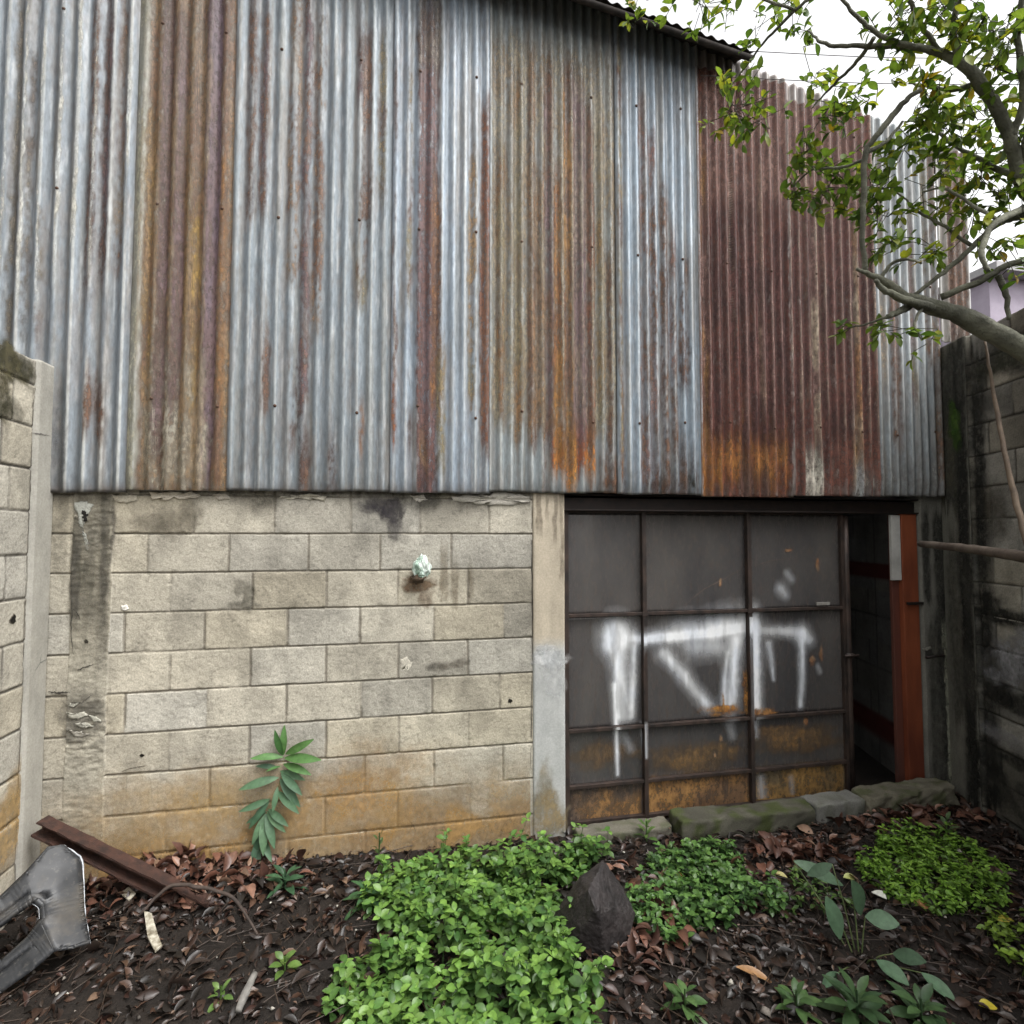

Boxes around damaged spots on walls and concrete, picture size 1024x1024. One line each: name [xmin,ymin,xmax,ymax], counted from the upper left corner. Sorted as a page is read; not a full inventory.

rust [5,2,42,338]
rust [82,0,271,491]
rust [357,0,446,493]
rust [467,32,624,492]
rust [638,67,969,497]
leakage [64,695,99,742]
flaking render [74,501,94,551]
flaking render [66,701,102,737]
leakage [70,511,115,614]
leakage [139,490,342,506]
leakage [103,773,566,870]
leakage [922,333,1024,834]